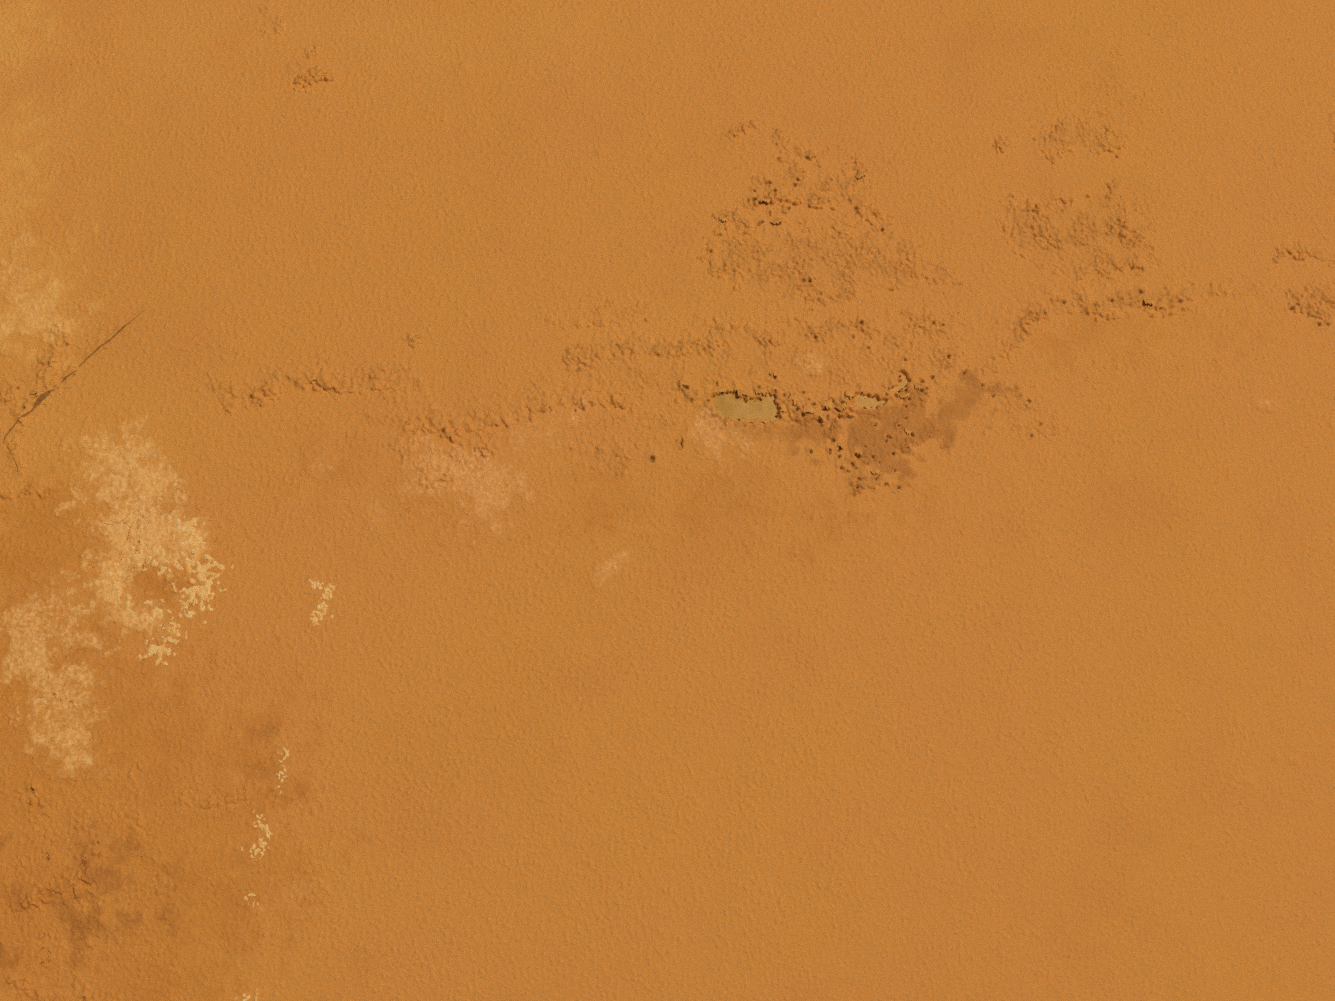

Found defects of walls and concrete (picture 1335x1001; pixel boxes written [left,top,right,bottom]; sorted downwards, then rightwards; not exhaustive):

crack [0,305,149,478]
peeling [559,301,978,430]
water stain [0,260,1320,1001]